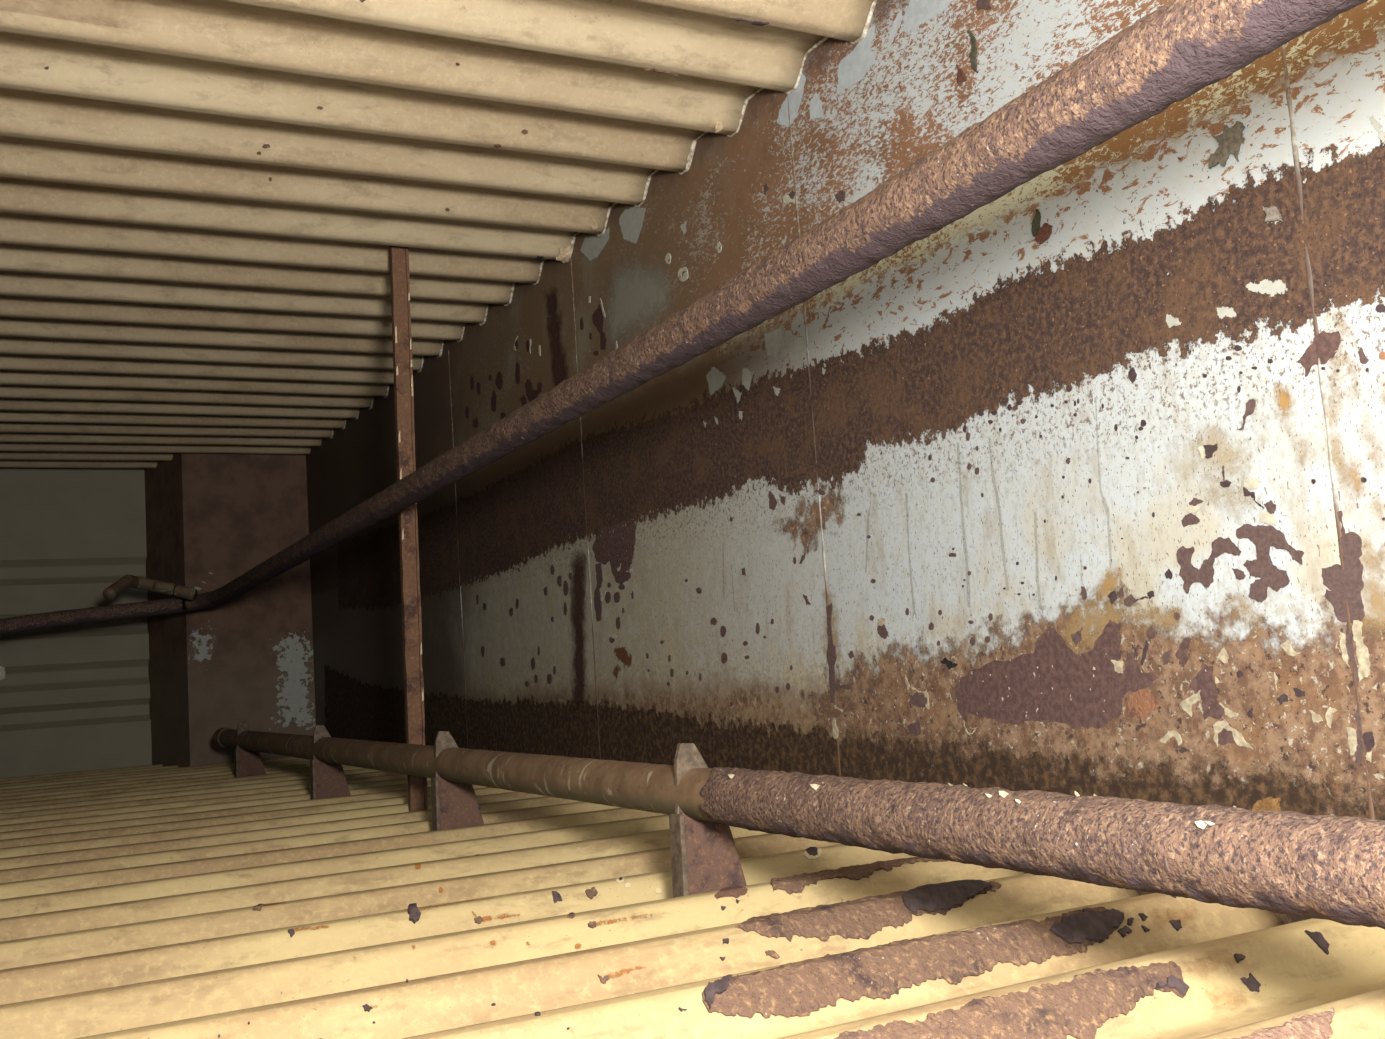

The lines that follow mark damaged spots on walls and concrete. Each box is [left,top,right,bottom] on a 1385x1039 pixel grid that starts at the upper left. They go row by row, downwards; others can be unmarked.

peeling [535,207,646,263]
peeling [1246,279,1288,297]
peeling [1296,314,1341,377]
peeling [963,386,1079,475]
corrosion [418,139,1385,821]
peeling [1165,444,1304,603]
corrosion [337,520,401,611]
corrosion [324,665,406,743]
peeling [954,587,1253,749]
peeling [1234,953,1261,992]
corrosion [1275,913,1311,924]
peeling [1304,930,1330,955]